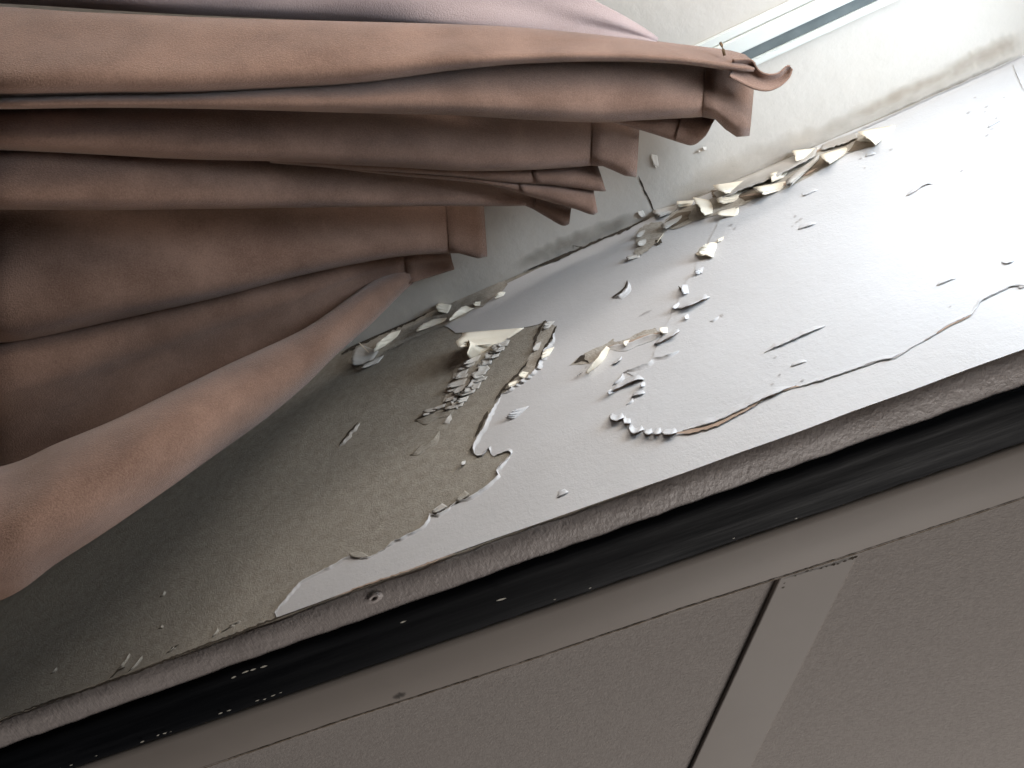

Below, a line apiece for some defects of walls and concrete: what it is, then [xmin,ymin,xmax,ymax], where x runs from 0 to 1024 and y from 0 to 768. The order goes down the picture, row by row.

peeling [626,125,896,274]
peeling [342,280,508,371]
peeling [568,284,709,436]
peeling [275,320,557,617]